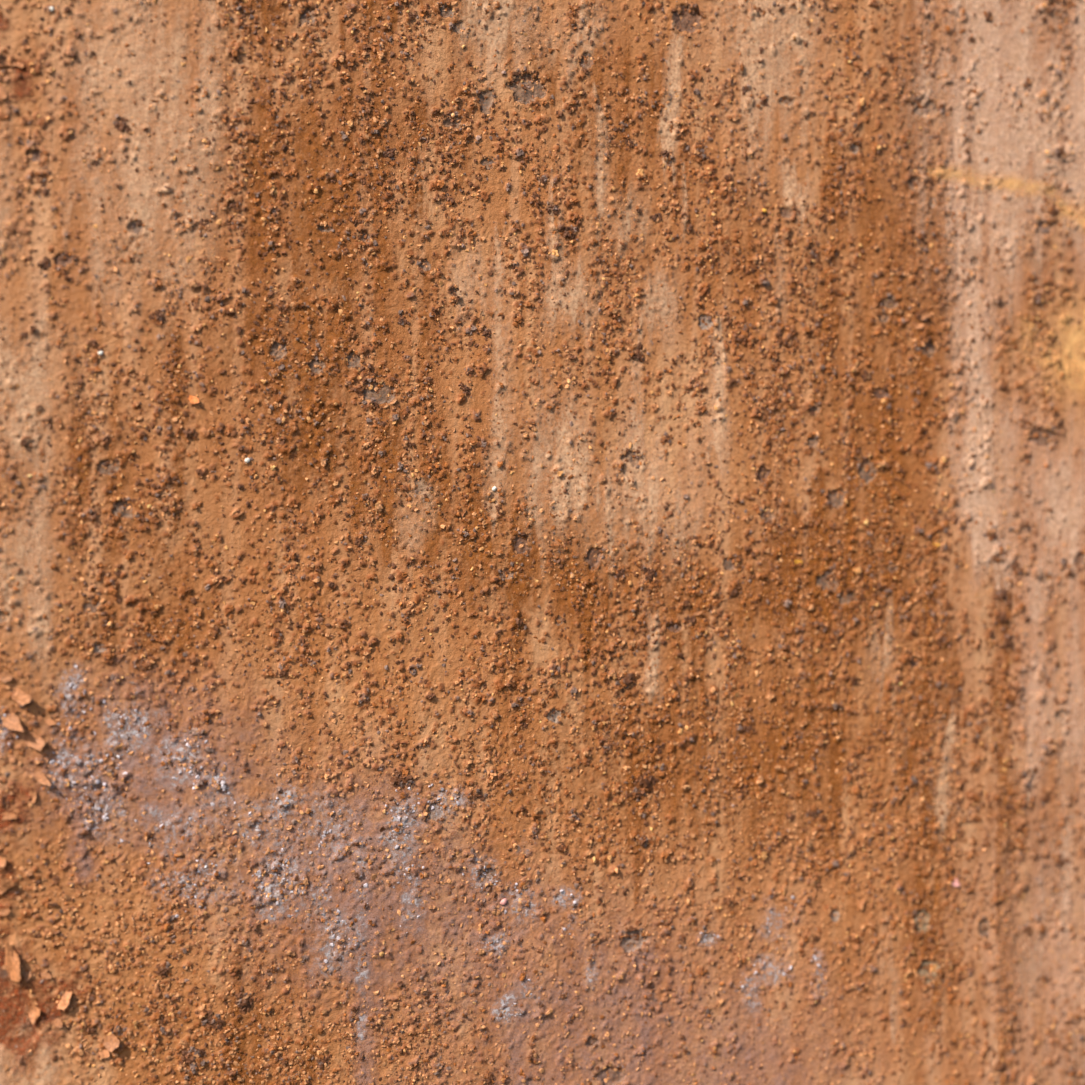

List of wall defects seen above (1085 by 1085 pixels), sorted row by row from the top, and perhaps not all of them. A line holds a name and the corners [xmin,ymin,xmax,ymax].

peeling [0,672,45,751]
peeling [0,771,51,829]
peeling [0,856,33,916]
peeling [0,930,83,1066]
peeling [99,1034,120,1058]
leakage [35,663,462,1082]
leakage [462,856,582,965]
leakage [493,962,651,1067]
leakage [733,895,797,1008]